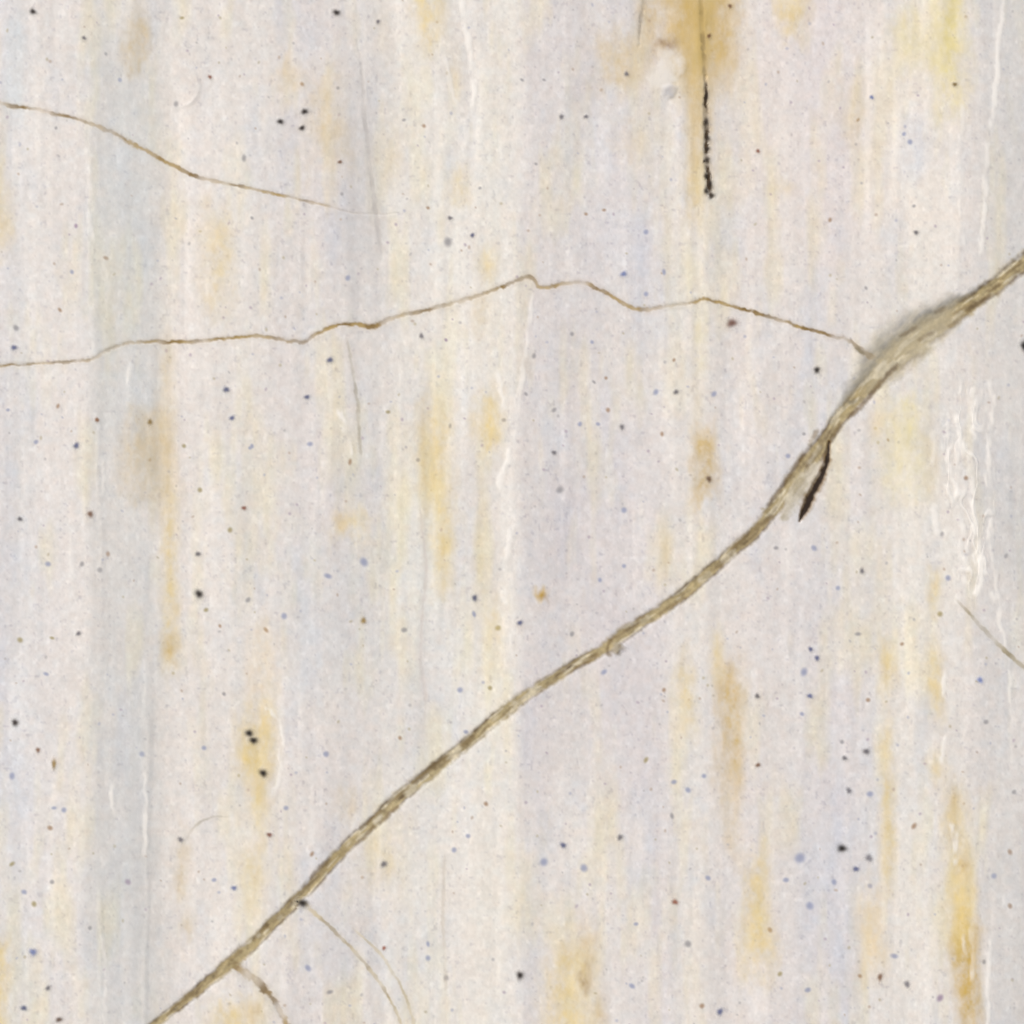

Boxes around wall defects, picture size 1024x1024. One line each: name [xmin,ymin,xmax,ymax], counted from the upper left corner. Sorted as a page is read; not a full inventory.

crack [0,42,387,259]
crack [693,0,719,202]
water stain [963,0,1024,291]
water stain [964,279,1024,676]
crack [0,246,1024,1024]
water stain [973,733,1024,1024]